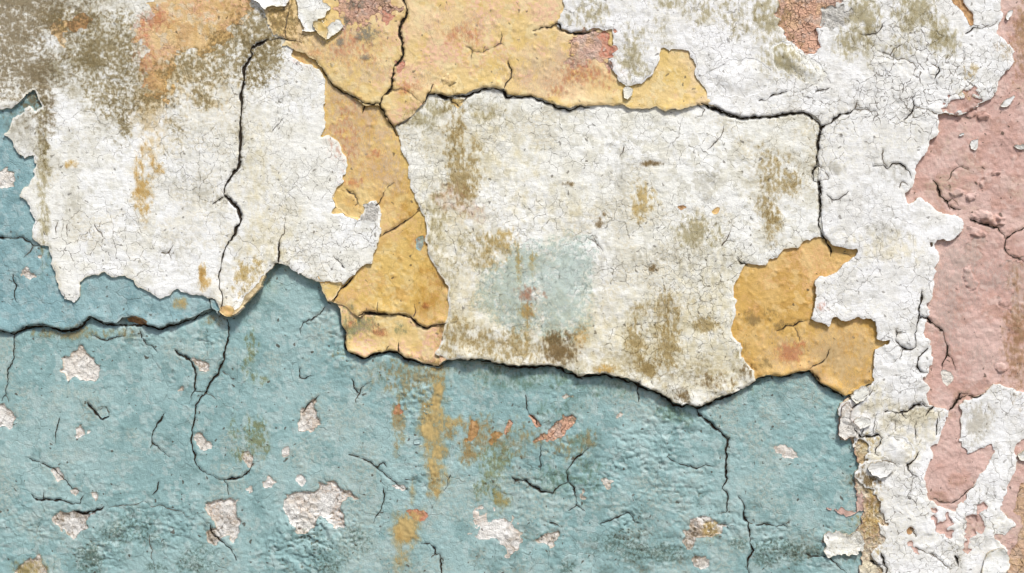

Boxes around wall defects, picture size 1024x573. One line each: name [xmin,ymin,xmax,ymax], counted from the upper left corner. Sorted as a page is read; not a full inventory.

peeling [0,0,714,332]
crack [695,78,876,261]
crack [0,0,596,494]
peeling [338,0,1024,573]
spalling [60,345,100,382]
spalling [51,467,98,539]
crack [29,418,186,517]
spalling [204,475,276,546]
spalling [282,474,359,534]
corrosion [393,511,420,542]
corrosion [421,369,460,494]
crack [343,291,983,573]